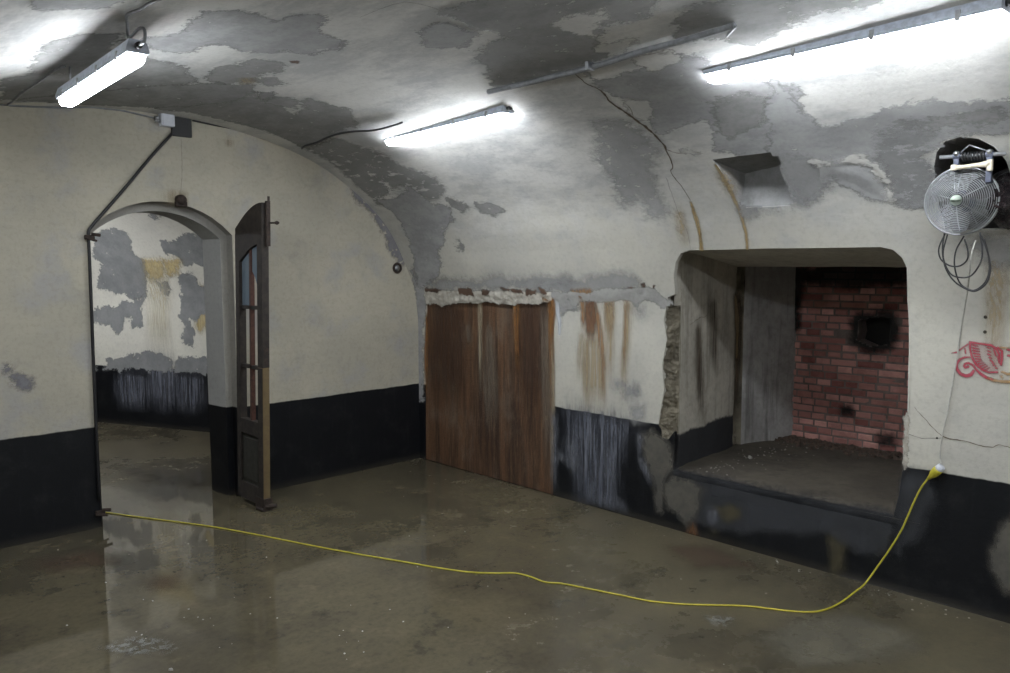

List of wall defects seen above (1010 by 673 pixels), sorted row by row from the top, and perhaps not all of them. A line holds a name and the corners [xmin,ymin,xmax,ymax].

peeling [0,33,125,103]
peeling [419,0,1010,209]
crack [575,74,703,243]
peeling [78,10,935,555]
peeling [3,364,35,390]
water stain [118,368,203,408]
rust [424,297,555,494]
rust [580,301,629,389]
water stain [552,409,651,506]